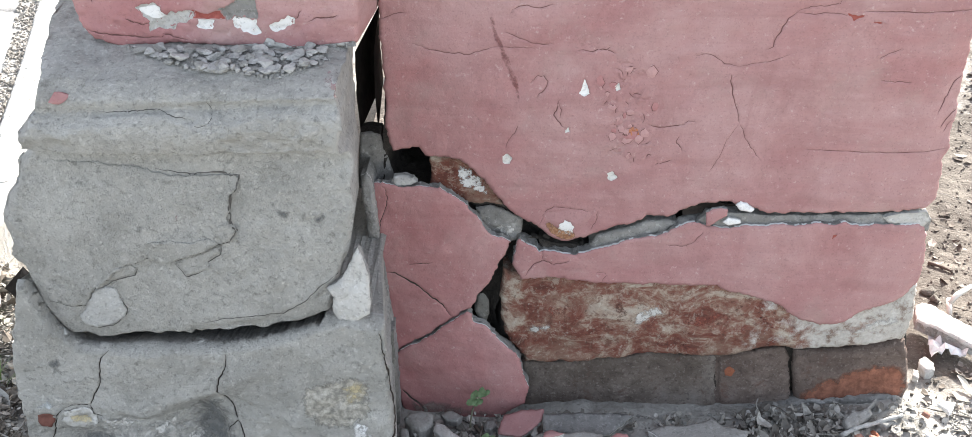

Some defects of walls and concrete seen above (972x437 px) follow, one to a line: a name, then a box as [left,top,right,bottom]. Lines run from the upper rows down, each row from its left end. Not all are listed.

peeling [135,0,356,49]
crack [412,32,552,55]
crack [535,75,562,125]
crack [696,1,972,169]
crack [651,121,694,164]
crack [669,203,737,247]
crack [390,263,450,315]
crack [485,207,597,328]
crack [53,351,108,437]
crack [216,355,245,437]